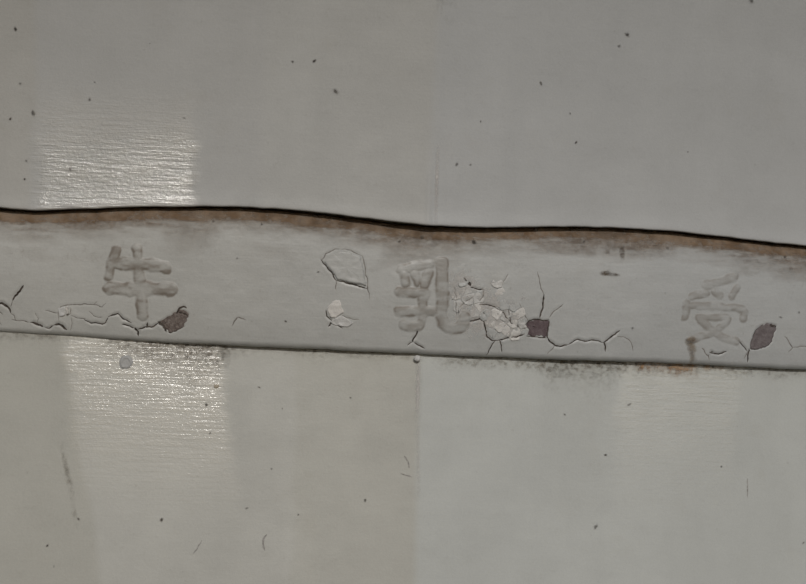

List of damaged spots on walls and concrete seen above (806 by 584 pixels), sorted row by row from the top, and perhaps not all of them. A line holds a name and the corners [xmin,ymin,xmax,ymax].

crack [0,285,158,336]
peeling [158,306,189,333]
peeling [326,300,359,328]
peeling [321,249,370,299]
peeling [450,275,550,355]
crack [520,272,562,321]
crack [547,331,633,354]
peeling [750,323,776,350]